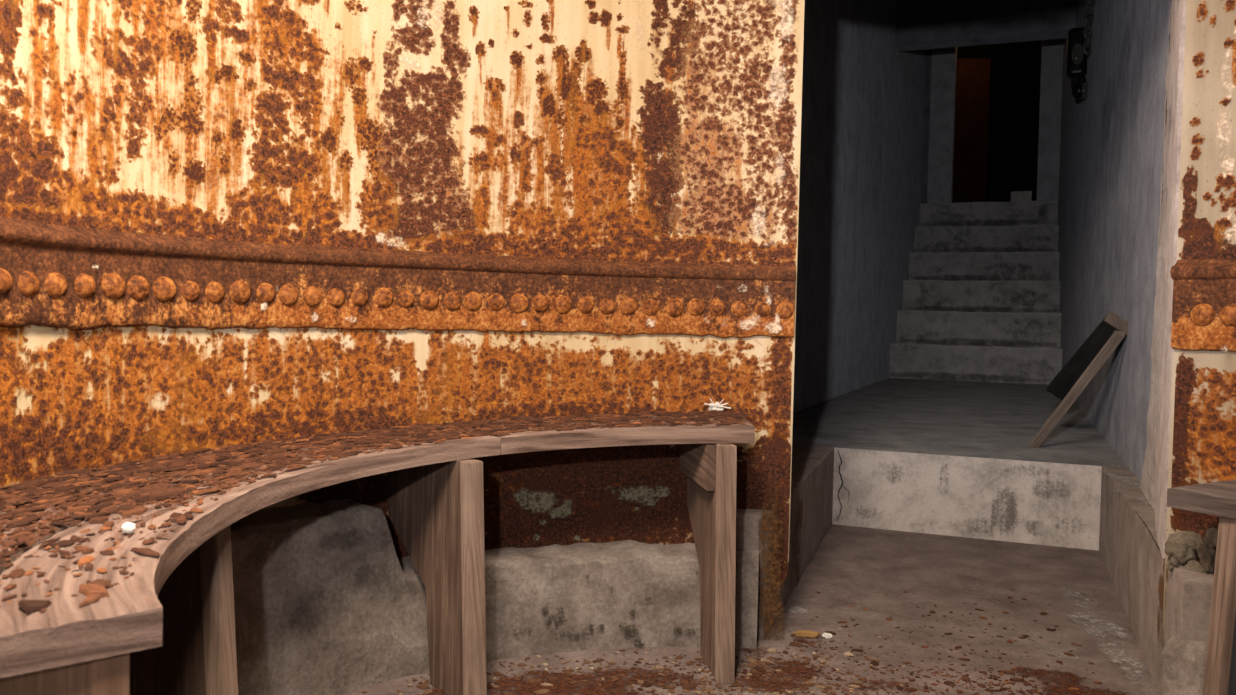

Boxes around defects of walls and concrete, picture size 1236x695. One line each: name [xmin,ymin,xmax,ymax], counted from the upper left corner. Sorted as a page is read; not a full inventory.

rust [1192,51,1209,78]
rust [1196,0,1236,85]
rust [0,0,799,266]
rust [1178,116,1236,260]
rust [0,325,825,695]
crack [837,449,850,521]
rust [1170,508,1220,563]
rust [1171,354,1236,488]